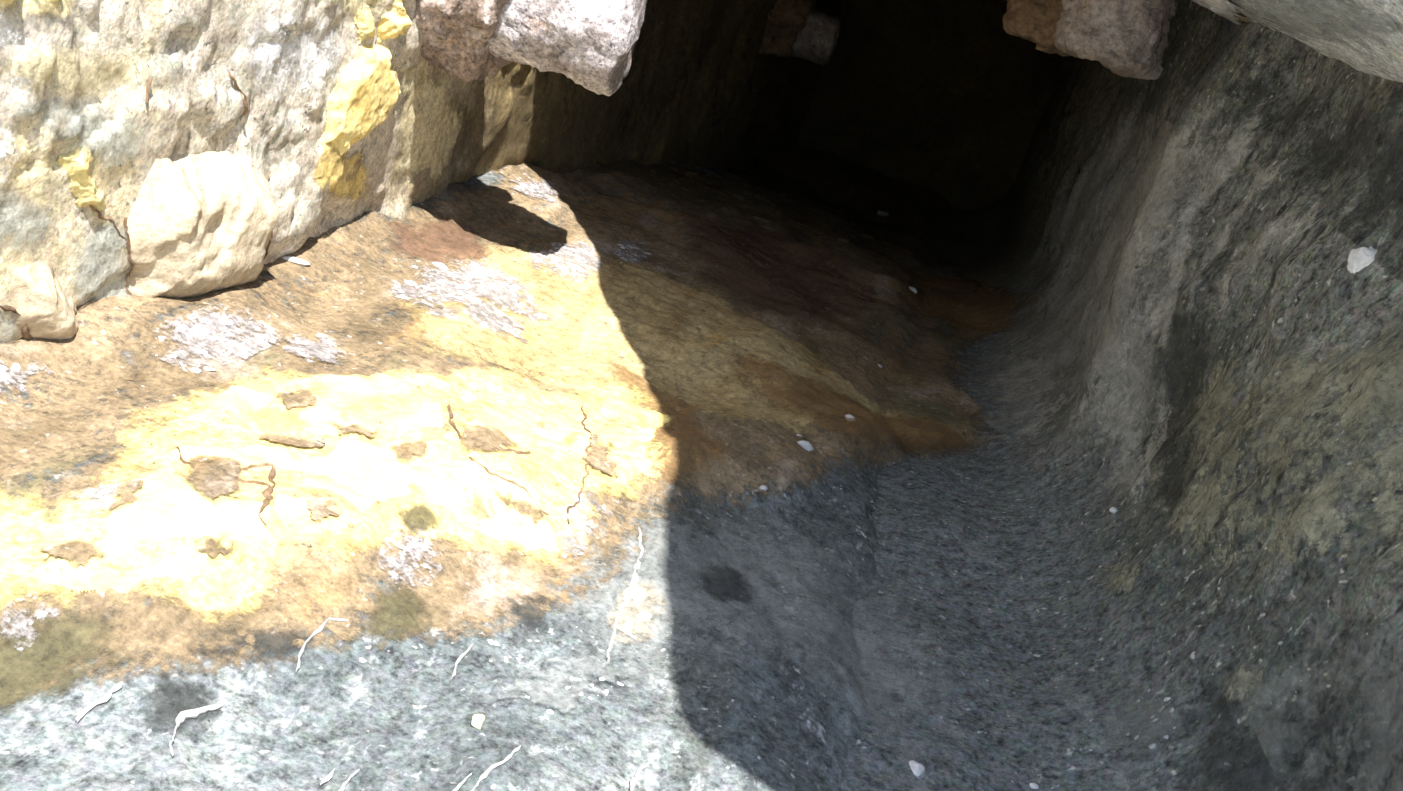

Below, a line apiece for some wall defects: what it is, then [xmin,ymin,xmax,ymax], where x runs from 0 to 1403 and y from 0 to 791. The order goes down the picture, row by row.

leakage [156,304,343,373]
leakage [392,258,552,343]